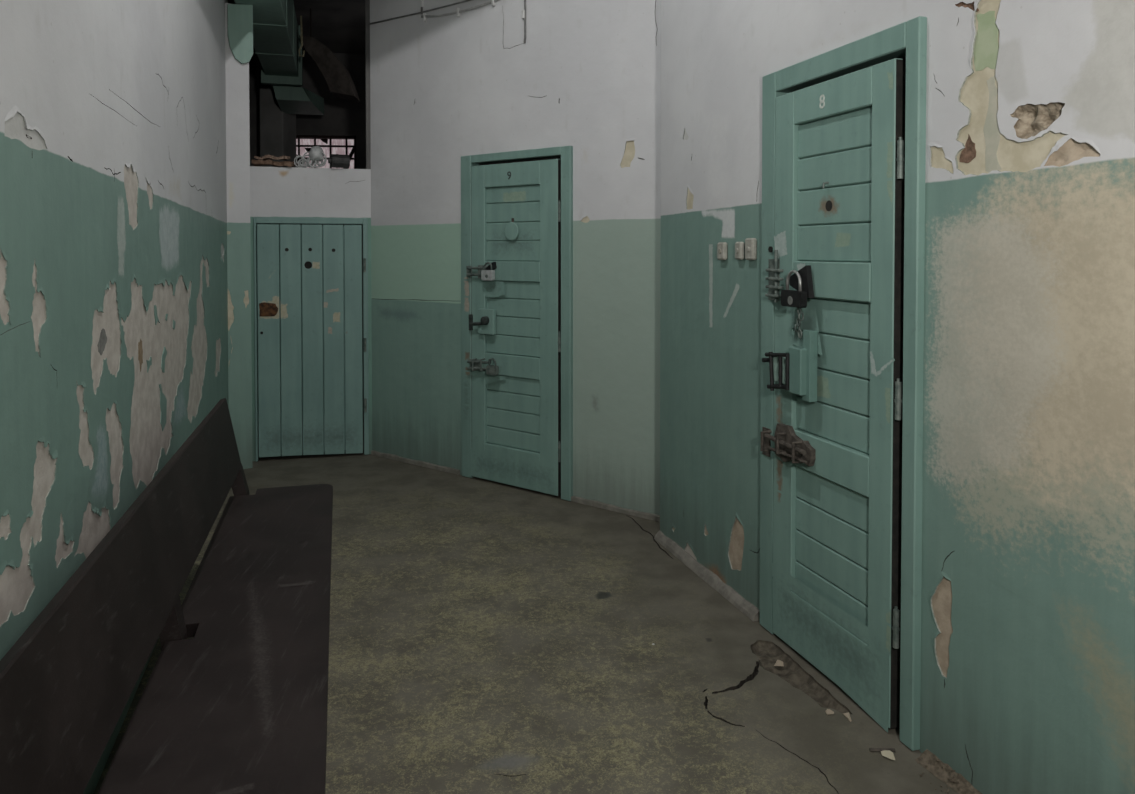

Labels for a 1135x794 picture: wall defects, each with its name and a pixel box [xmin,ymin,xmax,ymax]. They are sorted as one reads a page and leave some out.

peeling [5,105,48,150]
peeling [124,161,154,230]
peeling [619,138,635,168]
peeling [0,247,11,325]
peeling [31,261,48,357]
corrosion [259,302,278,316]
peeling [922,0,1135,630]
peeling [55,231,289,568]
peeling [0,436,59,627]
peeling [726,513,744,571]
peeling [928,572,953,678]
crack [703,661,839,794]